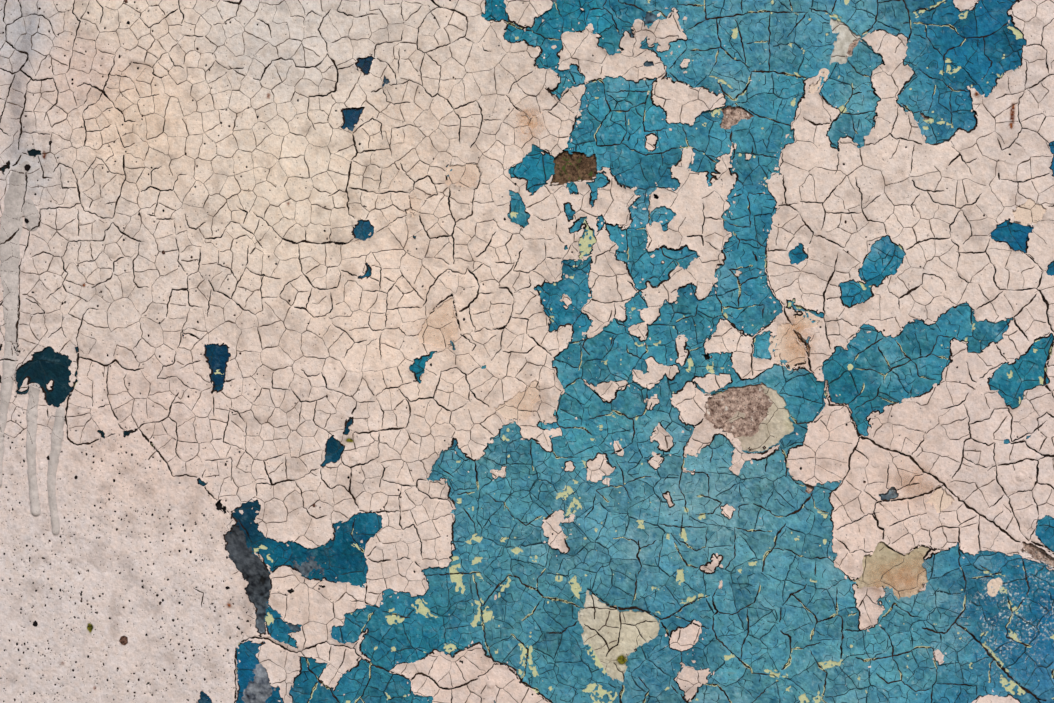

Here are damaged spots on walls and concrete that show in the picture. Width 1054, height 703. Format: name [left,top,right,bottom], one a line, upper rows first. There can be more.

crack [998,0,1054,33]
crack [796,108,832,147]
crack [567,179,614,228]
crack [843,281,866,306]
peeling [0,343,78,408]
peeling [204,343,231,394]
peeling [223,0,1054,703]
crack [680,355,731,396]
crack [0,387,58,444]
crack [272,541,301,569]
peeling [198,691,212,703]
crack [234,648,253,703]